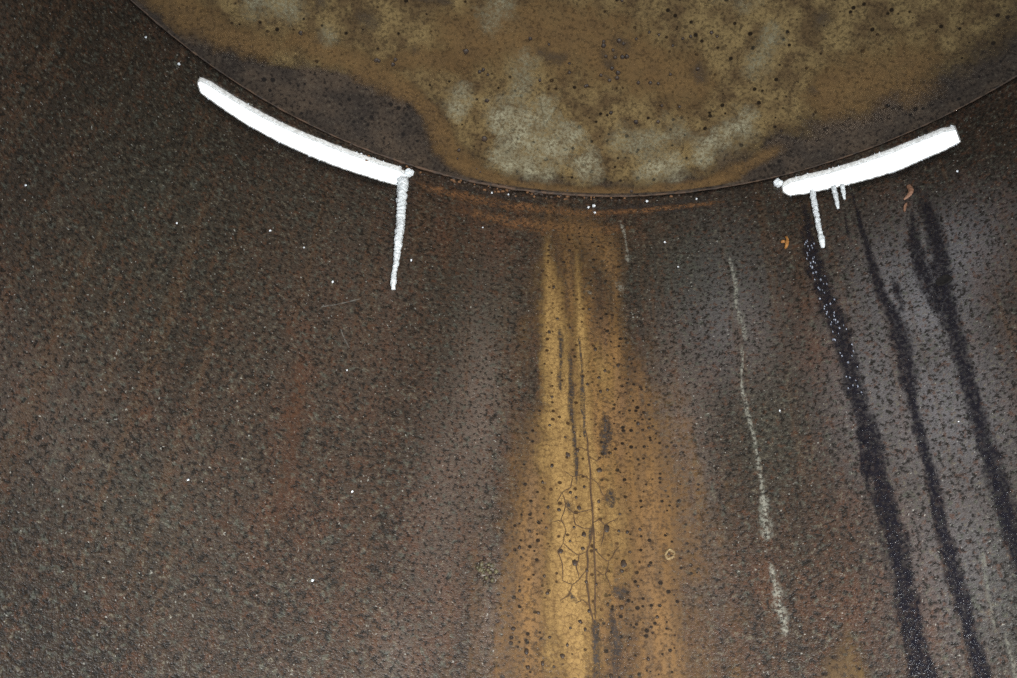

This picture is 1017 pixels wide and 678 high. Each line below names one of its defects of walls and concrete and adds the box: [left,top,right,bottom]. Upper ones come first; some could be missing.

rust [150,0,1017,279]
crack [553,432,619,624]
rust [511,247,683,678]
leakage [801,207,937,678]
leakage [845,197,991,678]
leakage [906,195,1017,567]